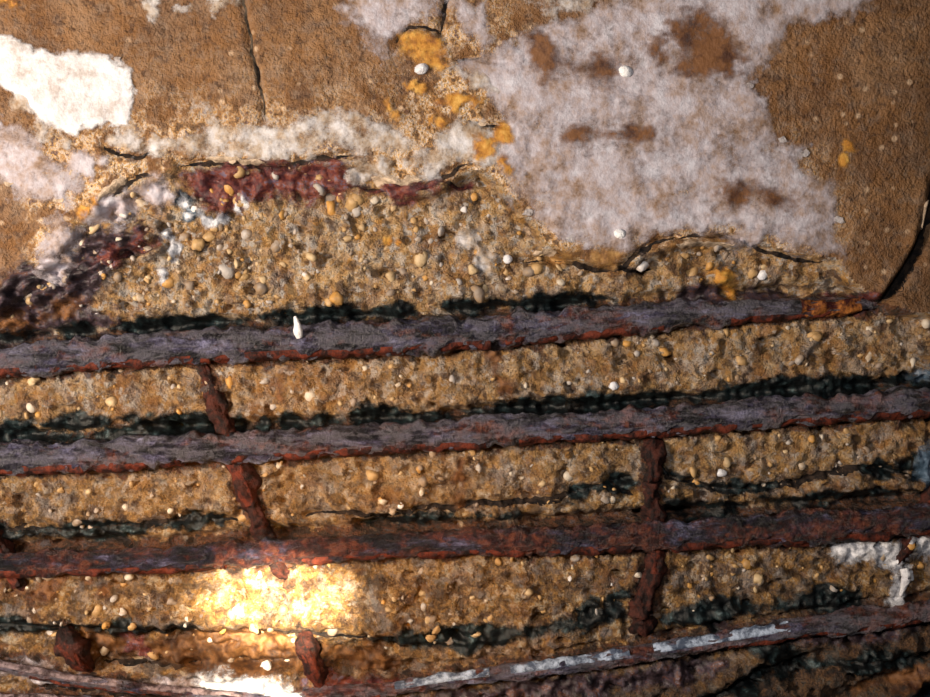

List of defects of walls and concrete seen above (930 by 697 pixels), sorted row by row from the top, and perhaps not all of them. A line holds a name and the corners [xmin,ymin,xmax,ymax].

efflorescence [157,228,182,285]
efflorescence [178,196,246,228]
rust [174,159,473,223]
spalling [0,0,869,340]
crack [870,187,930,304]
rust [677,266,881,328]
spalling [0,301,930,445]
spalling [250,439,648,540]
leakage [830,536,930,606]
spalling [0,536,930,697]
rust [57,626,402,688]
rust [403,620,930,697]